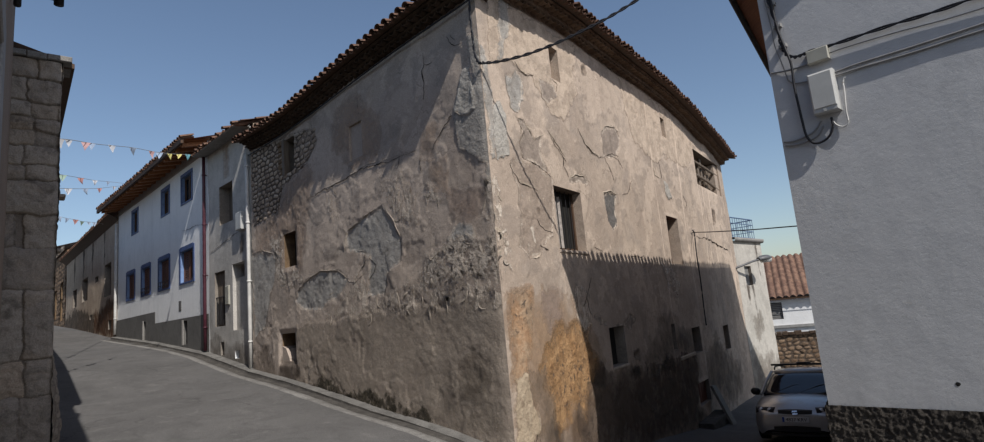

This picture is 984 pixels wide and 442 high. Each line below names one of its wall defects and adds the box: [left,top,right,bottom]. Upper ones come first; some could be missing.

crack [308,114,451,198]
peeling [250,61,557,339]
crack [547,129,632,194]
peeling [601,125,619,158]
spalling [603,190,617,230]
spalling [515,320,602,442]
water stain [577,331,707,442]